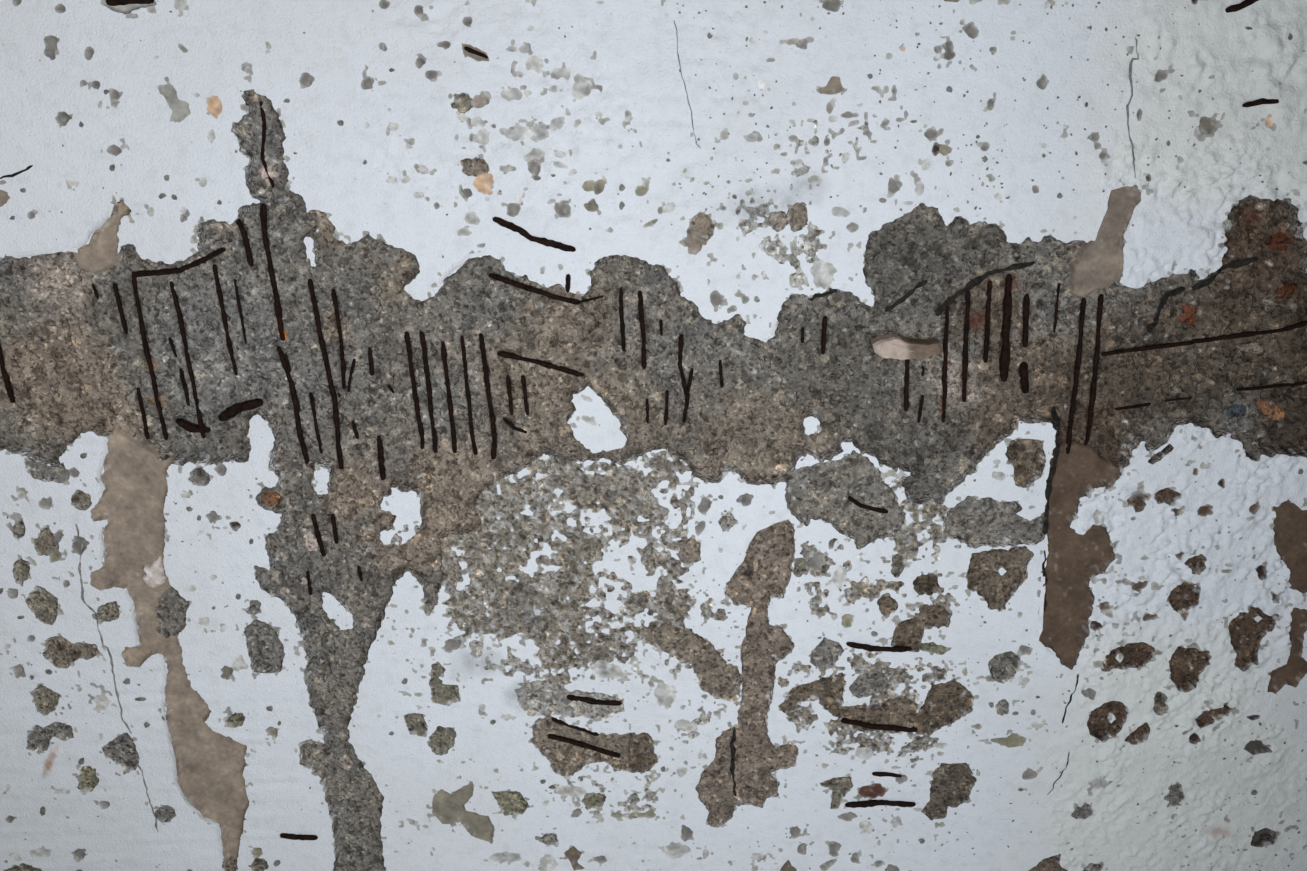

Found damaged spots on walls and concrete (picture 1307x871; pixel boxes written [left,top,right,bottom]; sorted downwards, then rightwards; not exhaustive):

corrosion [473,173,494,195]
spalling [493,203,576,252]
peeling [735,197,827,291]
spalling [7,559,100,669]
spalling [244,600,285,674]
spalling [1167,552,1207,621]
spalling [13,664,74,752]
spalling [77,733,140,809]
spalling [404,713,457,756]
spalling [432,781,529,844]
spalling [819,763,977,821]
spalling [1081,642,1211,745]